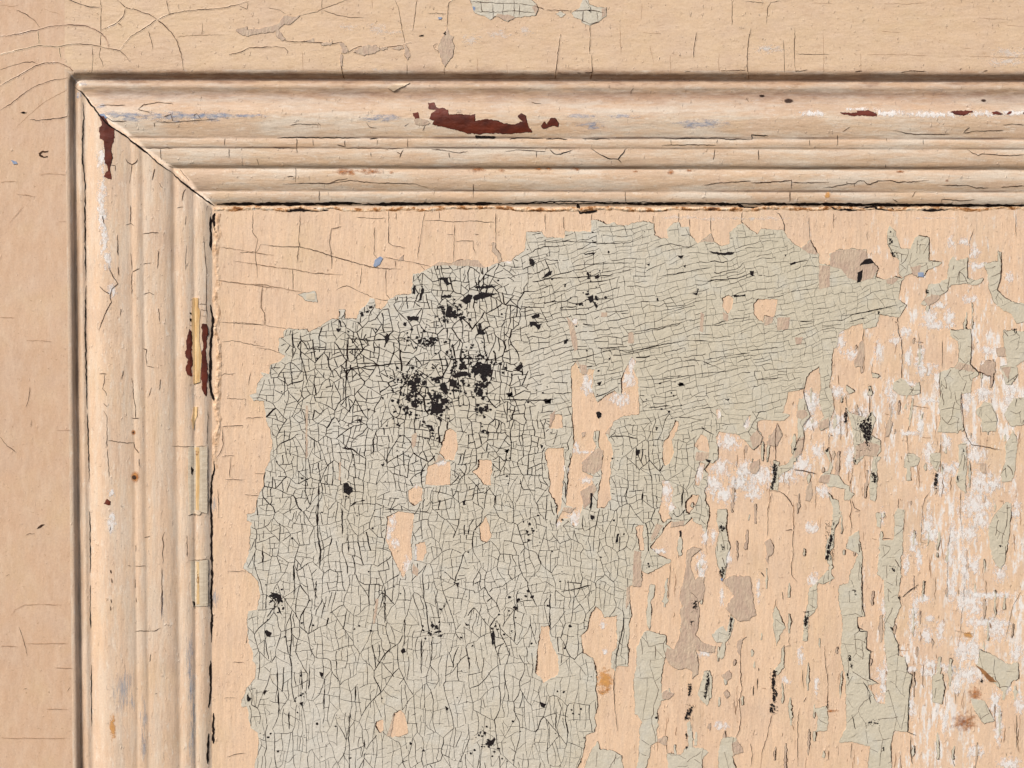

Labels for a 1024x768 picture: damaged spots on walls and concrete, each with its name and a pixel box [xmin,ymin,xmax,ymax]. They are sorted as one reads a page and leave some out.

peeling [96,104,260,268]
peeling [413,102,595,139]
peeling [470,0,539,35]
crack [0,0,1024,471]
peeling [840,107,1024,118]
peeling [185,206,1024,528]
crack [89,512,165,656]
crack [293,418,321,609]
crack [341,428,496,673]
crack [502,230,1023,768]
peeling [583,225,1024,768]
crack [277,669,290,730]